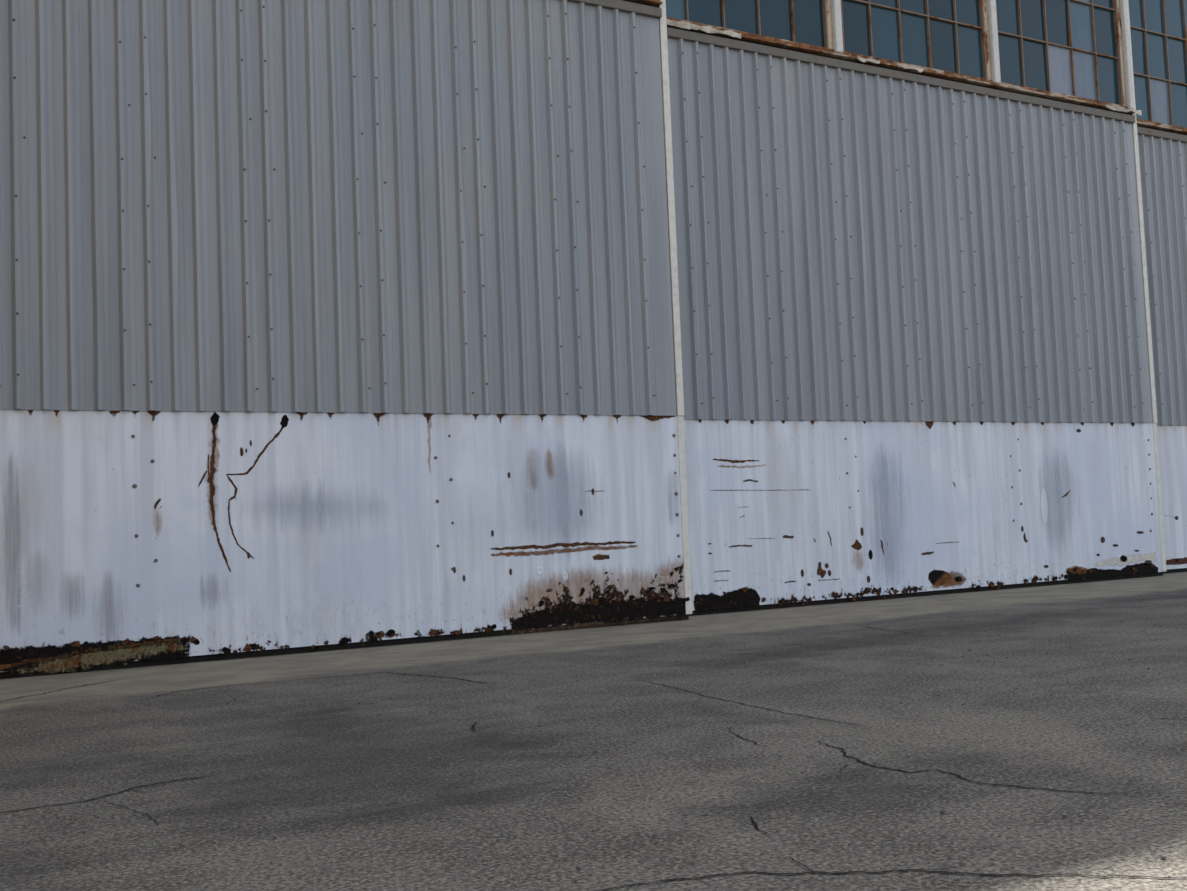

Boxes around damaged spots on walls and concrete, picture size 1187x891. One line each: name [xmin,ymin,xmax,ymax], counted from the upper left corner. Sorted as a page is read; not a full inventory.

corrosion [198,412,231,572]
crack [226,415,289,559]
corrosion [713,458,760,468]
corrosion [1023,554,1187,586]
corrosion [311,541,1006,651]
corrosion [0,635,290,676]
crack [641,680,1122,795]
crack [0,775,221,825]
crack [596,856,1187,891]